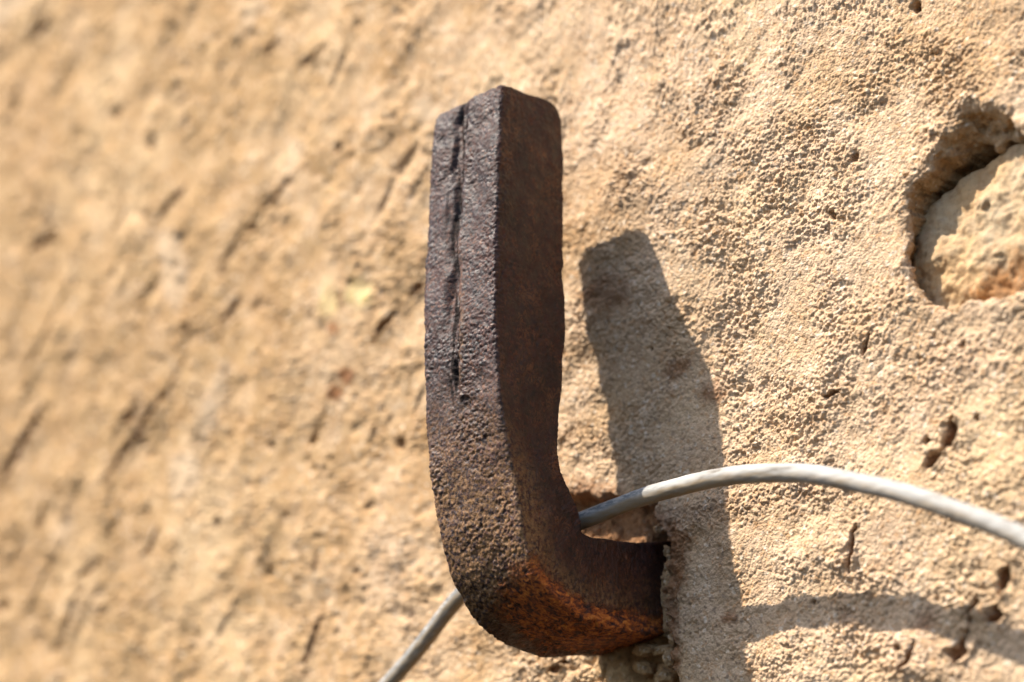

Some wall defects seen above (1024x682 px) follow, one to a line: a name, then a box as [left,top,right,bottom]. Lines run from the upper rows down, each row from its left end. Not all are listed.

spalling [908,108,1024,313]
corrosion [498,526,688,668]